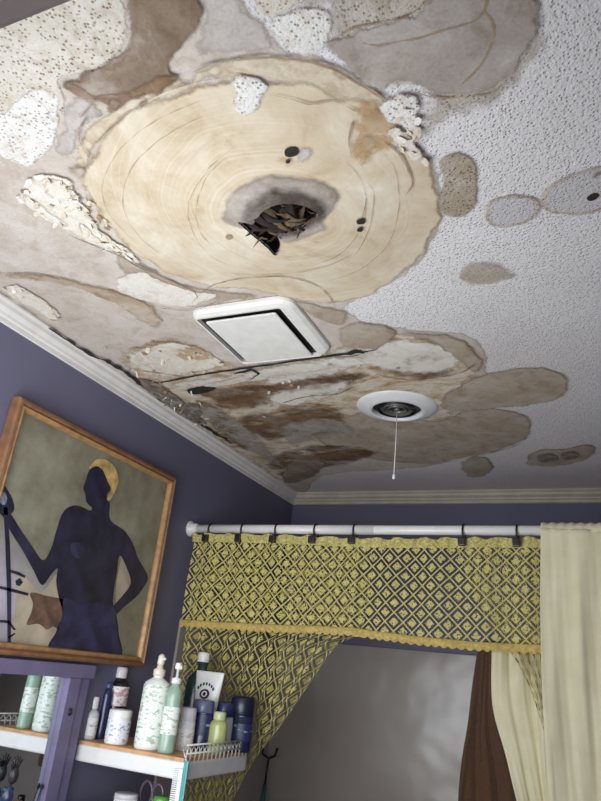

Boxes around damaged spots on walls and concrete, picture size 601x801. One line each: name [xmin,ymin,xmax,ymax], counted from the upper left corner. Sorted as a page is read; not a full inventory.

leakage [63,0,389,169]
peeling [155,0,540,195]
peeling [0,0,376,391]
leakage [222,176,338,242]
leakage [437,153,477,217]
leakage [485,167,601,227]
leakage [114,246,254,307]
peeling [395,228,438,279]
crack [49,328,377,444]
leakage [122,276,567,483]
peeling [388,327,488,385]
peeling [198,425,450,492]